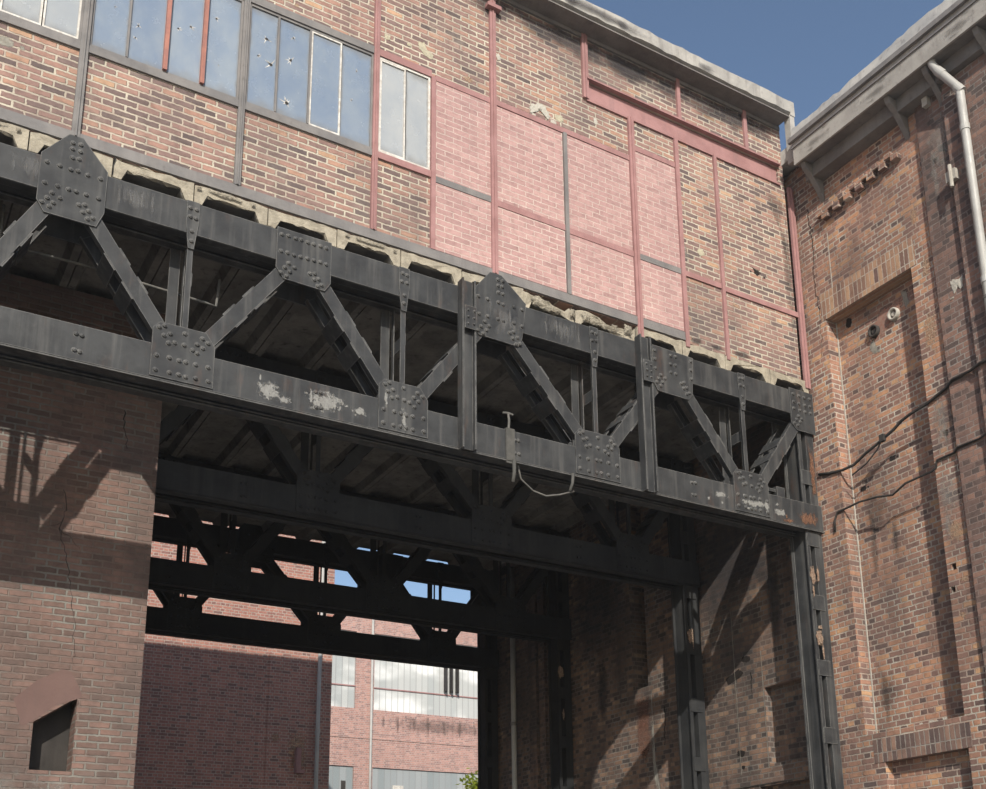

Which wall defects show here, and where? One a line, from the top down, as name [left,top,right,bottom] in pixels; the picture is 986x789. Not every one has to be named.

spalling [532,295,632,335]
crack [50,491,80,661]